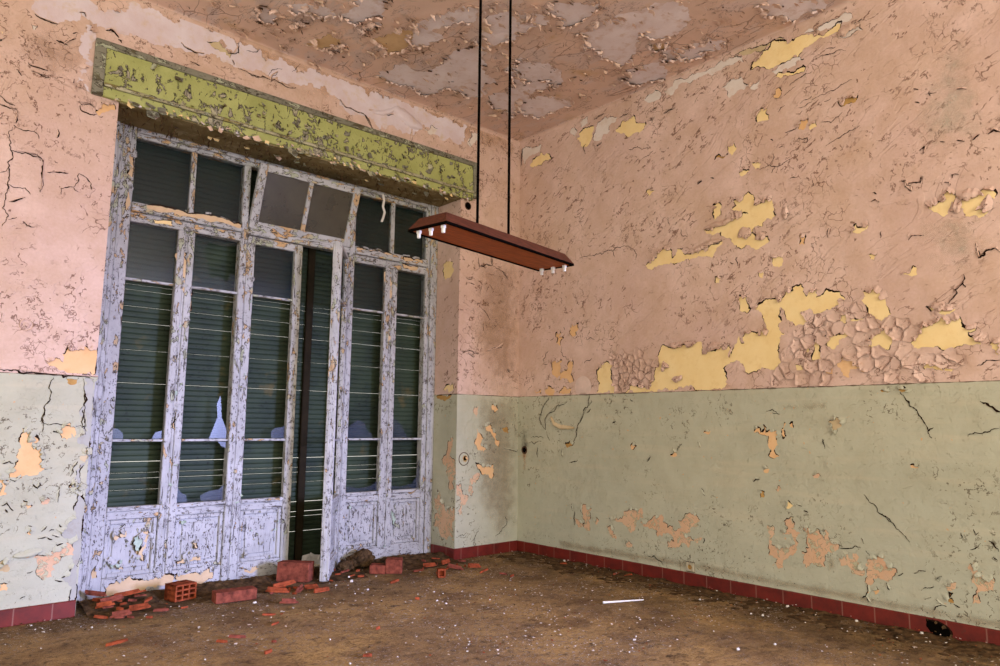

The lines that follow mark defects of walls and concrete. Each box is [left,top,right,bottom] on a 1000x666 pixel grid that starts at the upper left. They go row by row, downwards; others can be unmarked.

crack [17,62,102,118]
flaking render [31,0,863,147]
crack [0,95,92,227]
peeling [646,191,785,278]
peeling [0,425,49,496]
crack [0,367,92,434]
peeling [34,343,98,601]
peeling [434,402,510,541]
crack [504,395,592,463]
peeling [596,283,892,393]
crack [769,298,998,438]
peeling [911,303,1000,372]